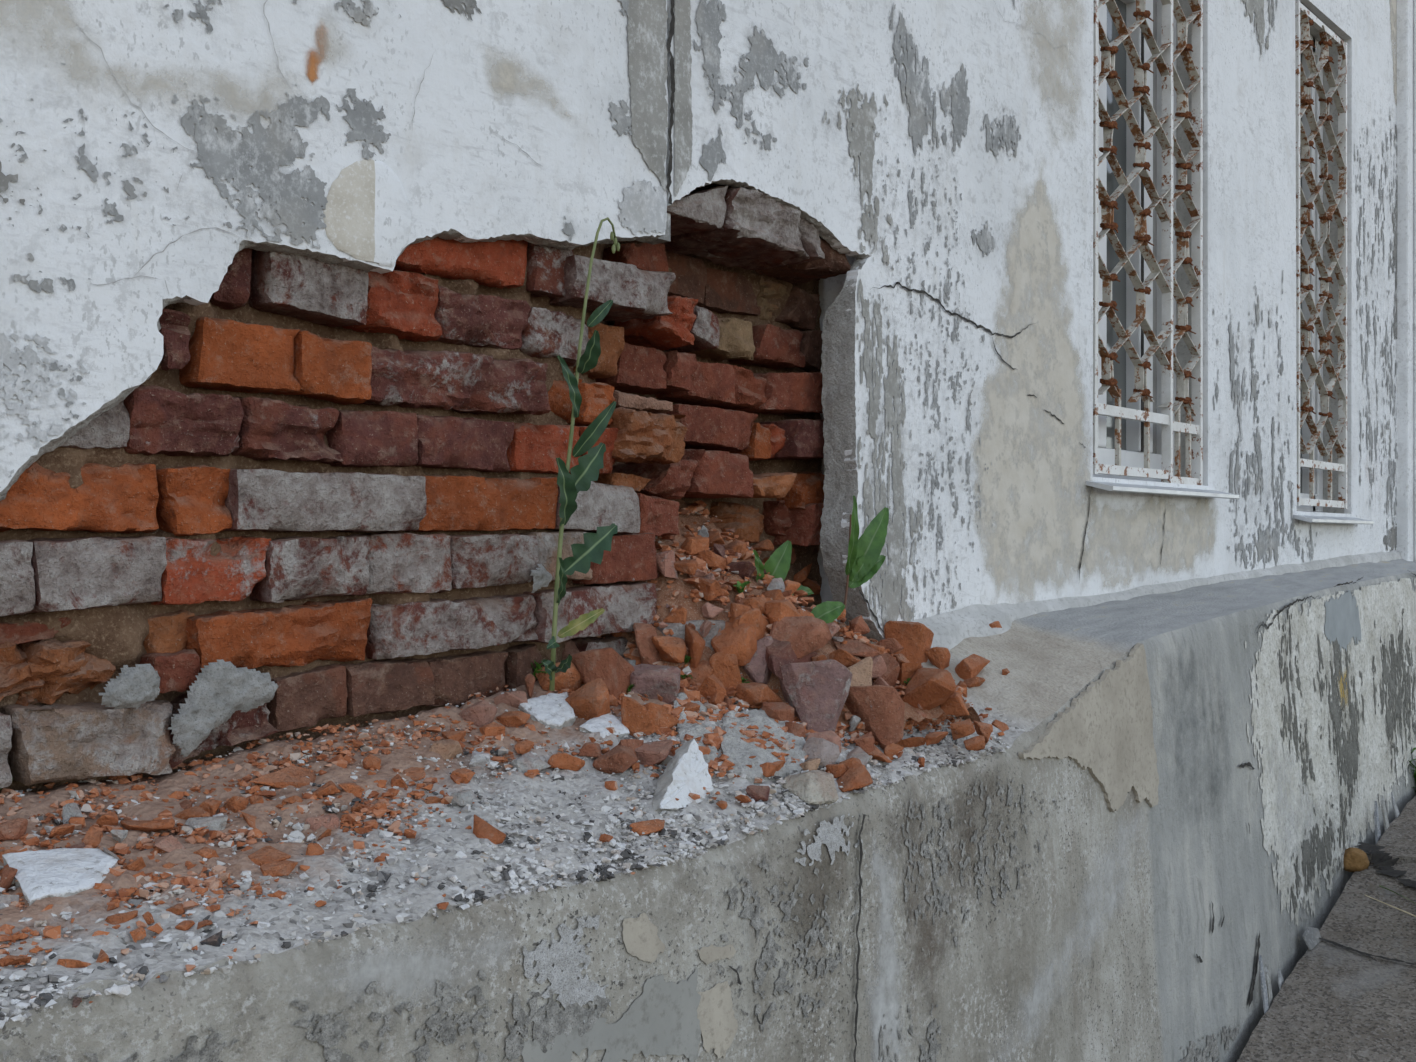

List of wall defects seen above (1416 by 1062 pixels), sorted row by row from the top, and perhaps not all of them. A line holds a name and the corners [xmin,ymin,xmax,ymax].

crack [666,0,675,205]
crack [872,282,1086,448]
damp [974,179,1215,598]
peeling [1353,111,1398,552]
crack [1079,487,1092,581]
peeling [1245,578,1416,949]
crack [728,965,761,1024]
crack [853,814,866,1062]